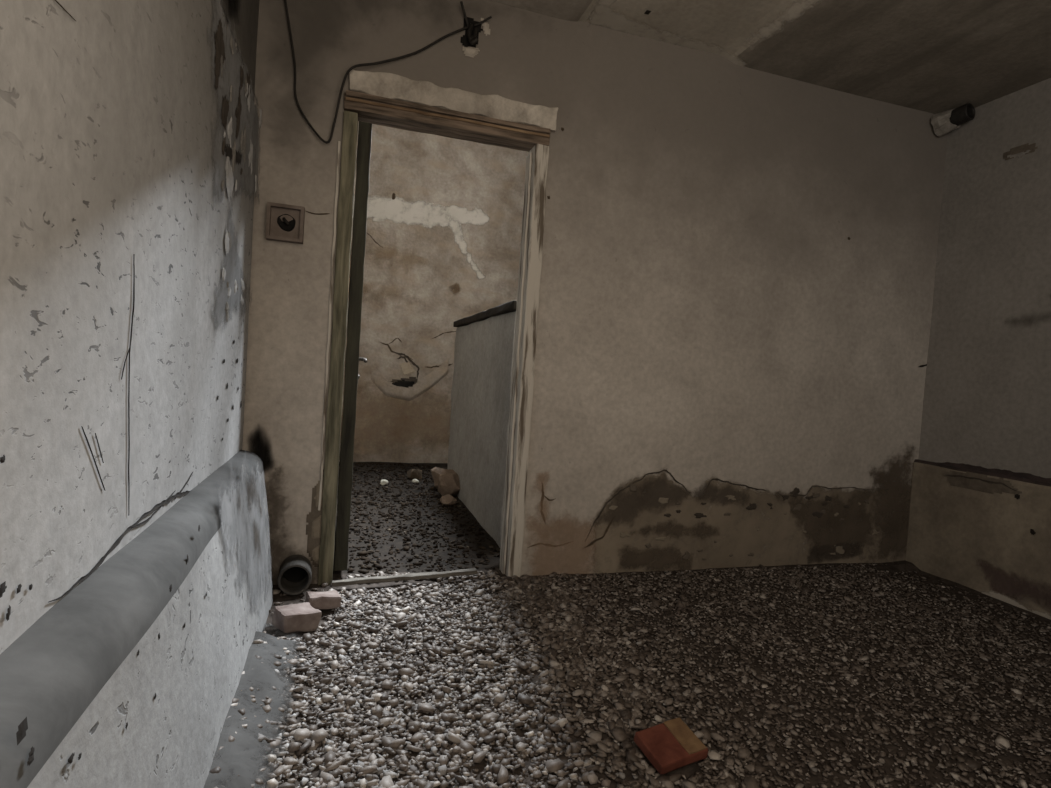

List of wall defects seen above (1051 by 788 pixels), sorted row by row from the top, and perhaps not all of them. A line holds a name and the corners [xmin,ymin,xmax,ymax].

crack [380,338,452,368]
water stain [604,476,748,522]
spalling [585,469,906,574]
water stain [776,447,914,562]
water stain [620,522,716,572]